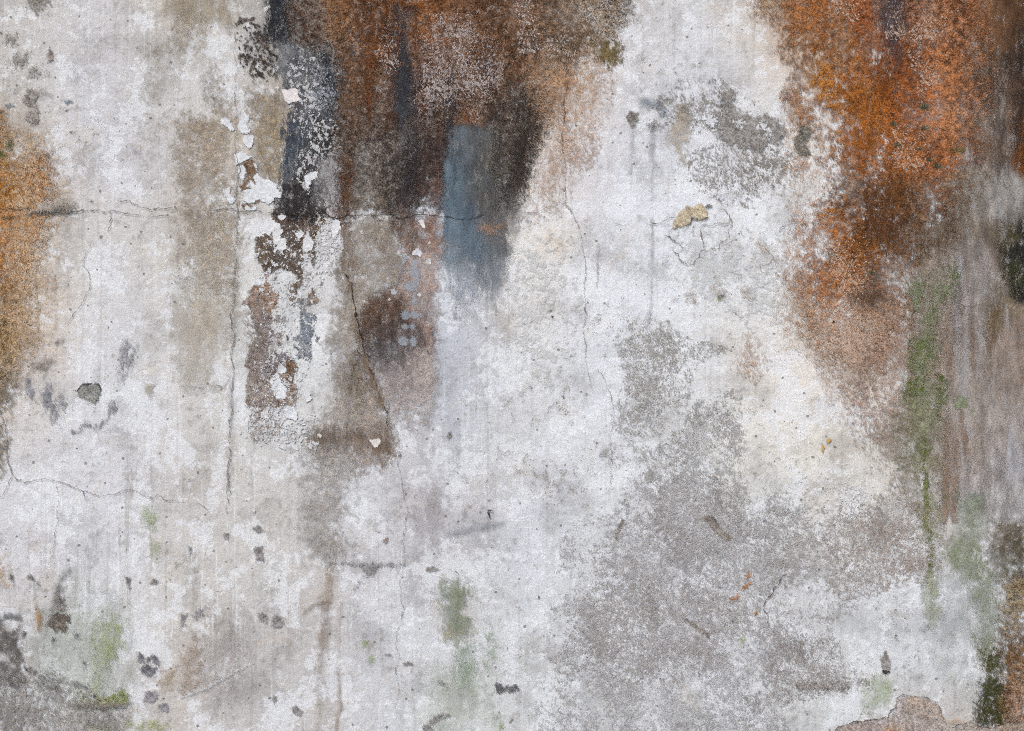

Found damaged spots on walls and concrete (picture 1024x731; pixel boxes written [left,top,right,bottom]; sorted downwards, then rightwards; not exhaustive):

corrosion [0,109,74,478]
crack [0,32,484,552]
peeling [169,73,408,475]
damp [358,121,519,430]
corrosion [282,0,642,225]
spalling [626,78,812,229]
crack [653,193,793,278]
corrosion [749,0,996,500]
damp [905,0,1024,583]
peeling [533,316,948,731]
spalling [835,694,1024,731]